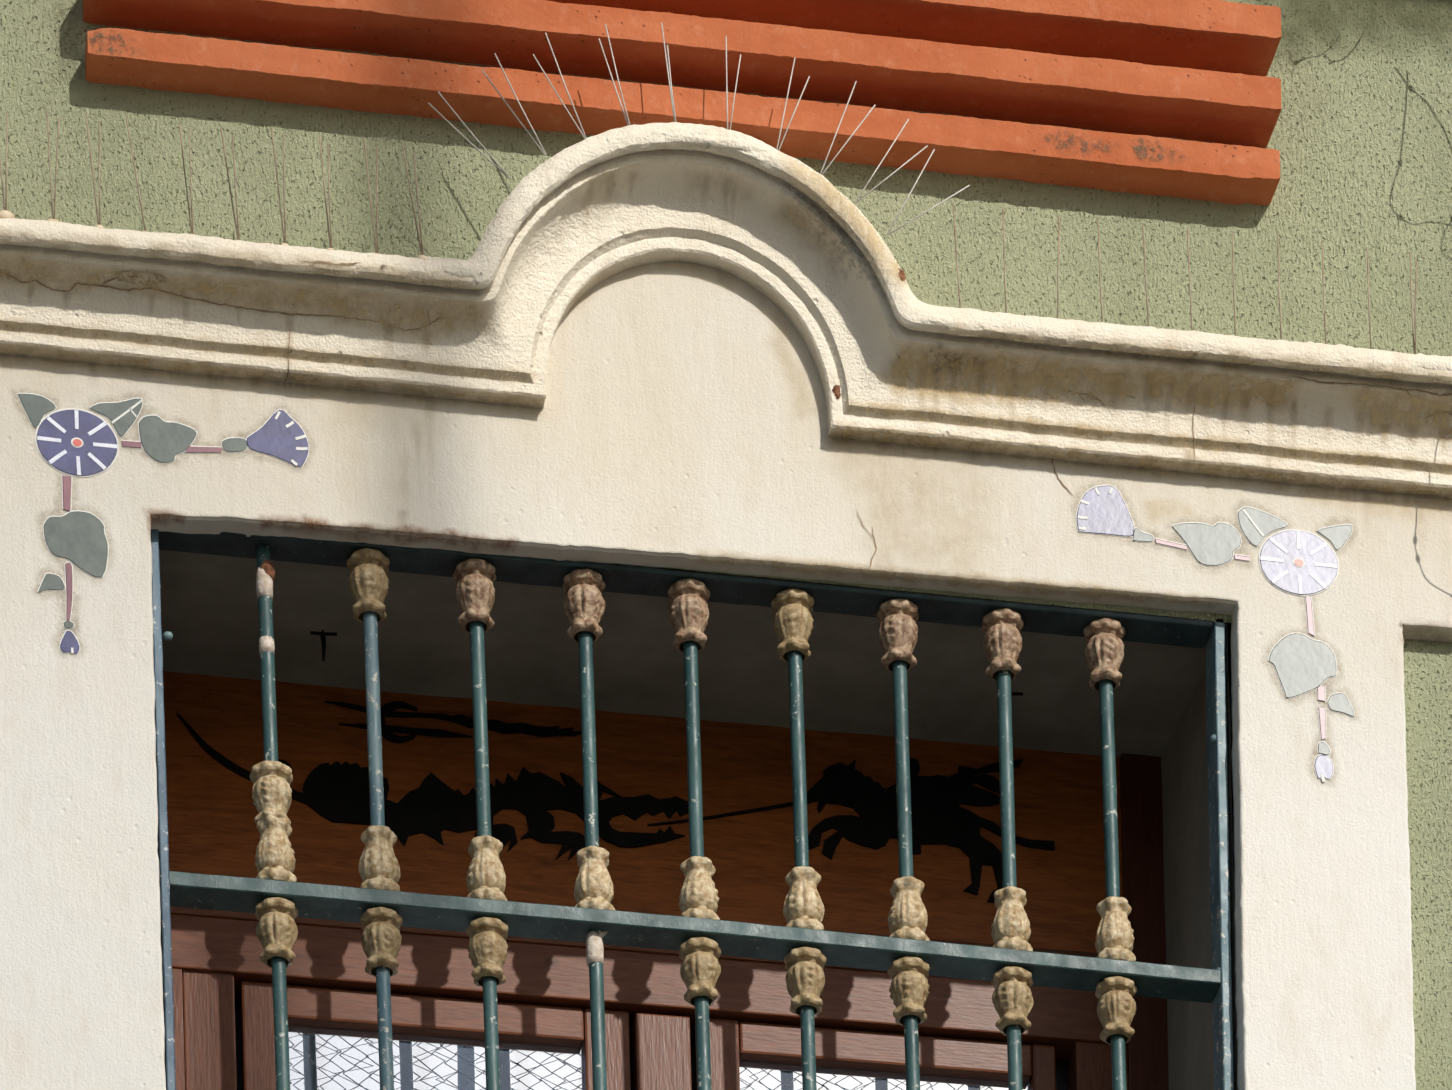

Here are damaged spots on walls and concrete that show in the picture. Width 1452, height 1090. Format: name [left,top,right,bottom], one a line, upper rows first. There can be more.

crack [0,239,446,390]
leakage [892,350,1290,407]
leakage [1070,426,1110,455]
leakage [1354,455,1417,468]